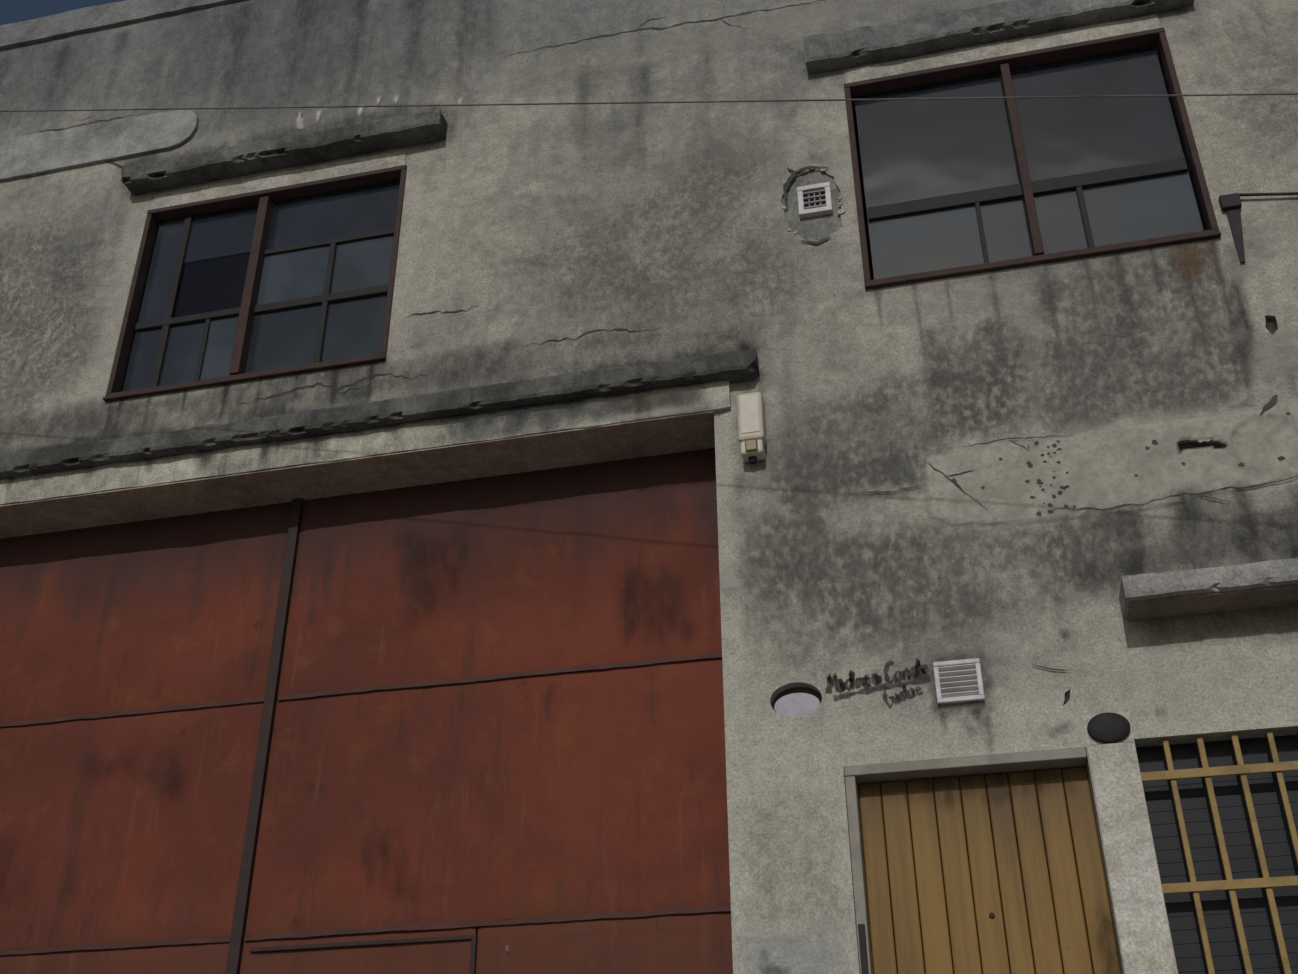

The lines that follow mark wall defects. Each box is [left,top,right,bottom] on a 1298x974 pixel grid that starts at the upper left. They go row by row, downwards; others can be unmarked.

crack [512,0,820,55]
spalling [782,165,845,241]
crack [405,305,479,318]
crack [525,327,662,346]
damp [927,241,1246,430]
crack [847,435,1071,509]
spalling [925,395,1298,524]
crack [1054,476,1297,510]
damp [1025,517,1155,585]